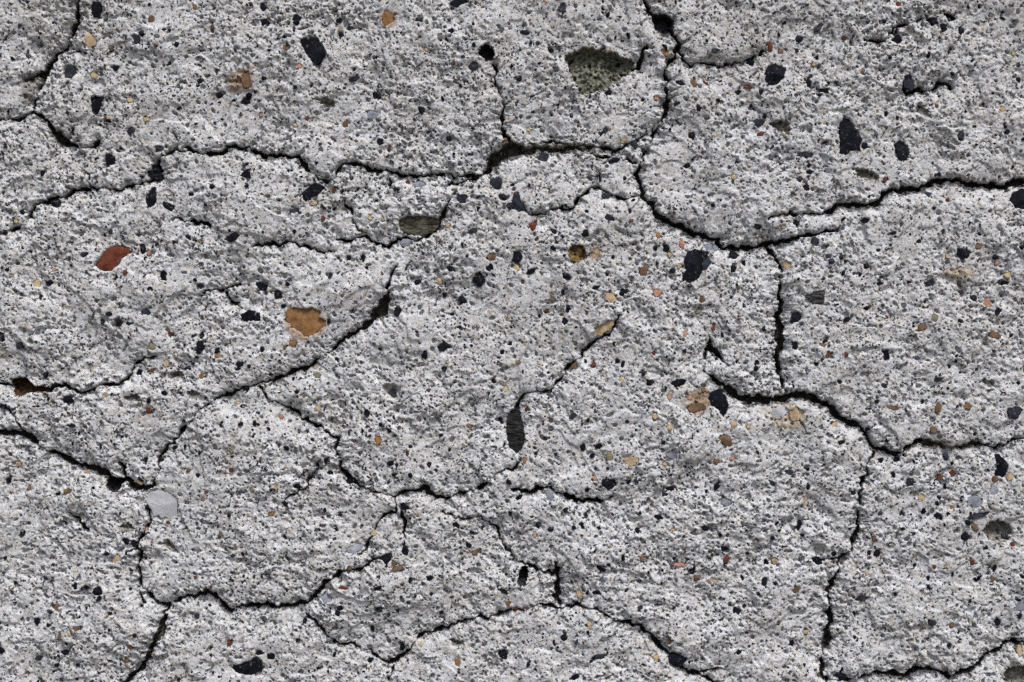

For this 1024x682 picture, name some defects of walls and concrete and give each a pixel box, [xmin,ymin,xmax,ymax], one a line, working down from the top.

crack [642,0,661,19]
crack [0,1,157,233]
crack [768,177,1024,220]
crack [157,18,951,682]
crack [953,437,1023,450]
crack [0,266,725,682]
crack [838,637,1024,682]